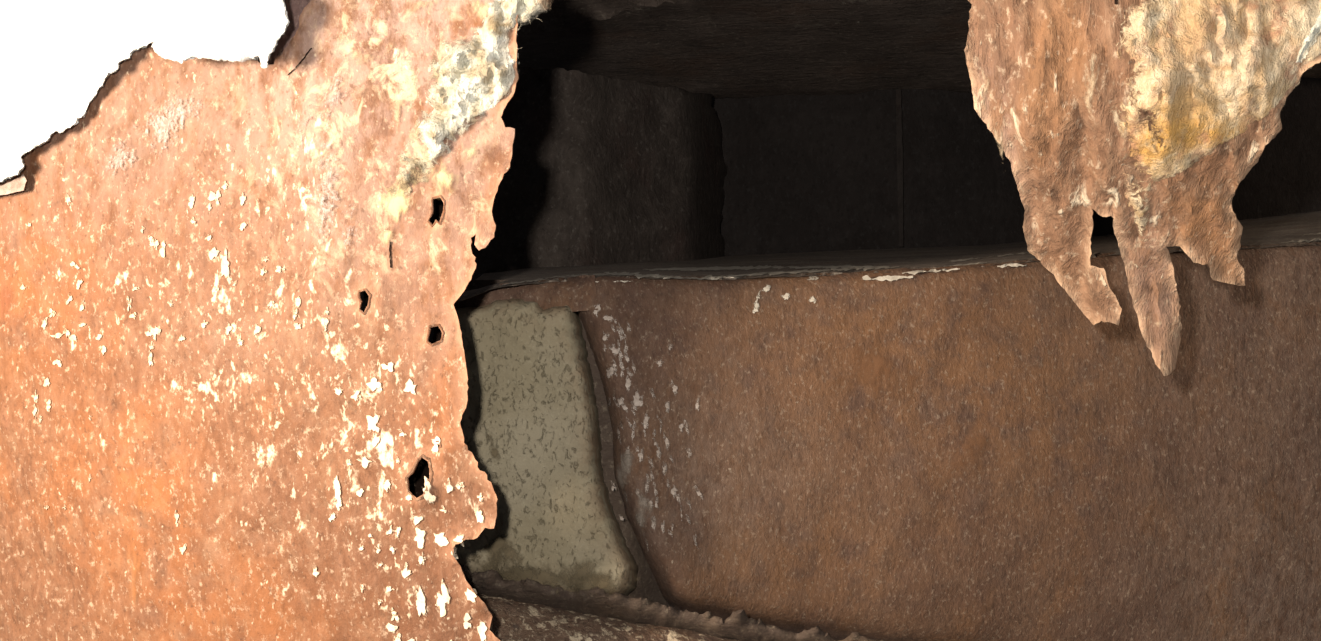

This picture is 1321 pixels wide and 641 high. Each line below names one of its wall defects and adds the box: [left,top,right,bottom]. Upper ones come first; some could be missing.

peeling [145,98,201,149]
peeling [188,181,246,224]
peeling [41,261,106,355]
peeling [205,234,236,290]
peeling [502,252,1030,313]
peeling [145,327,161,366]
peeling [32,359,62,422]
peeling [334,362,393,401]
peeling [403,379,416,394]
peeling [347,415,380,468]
peeling [329,476,364,522]
peeling [358,476,488,641]